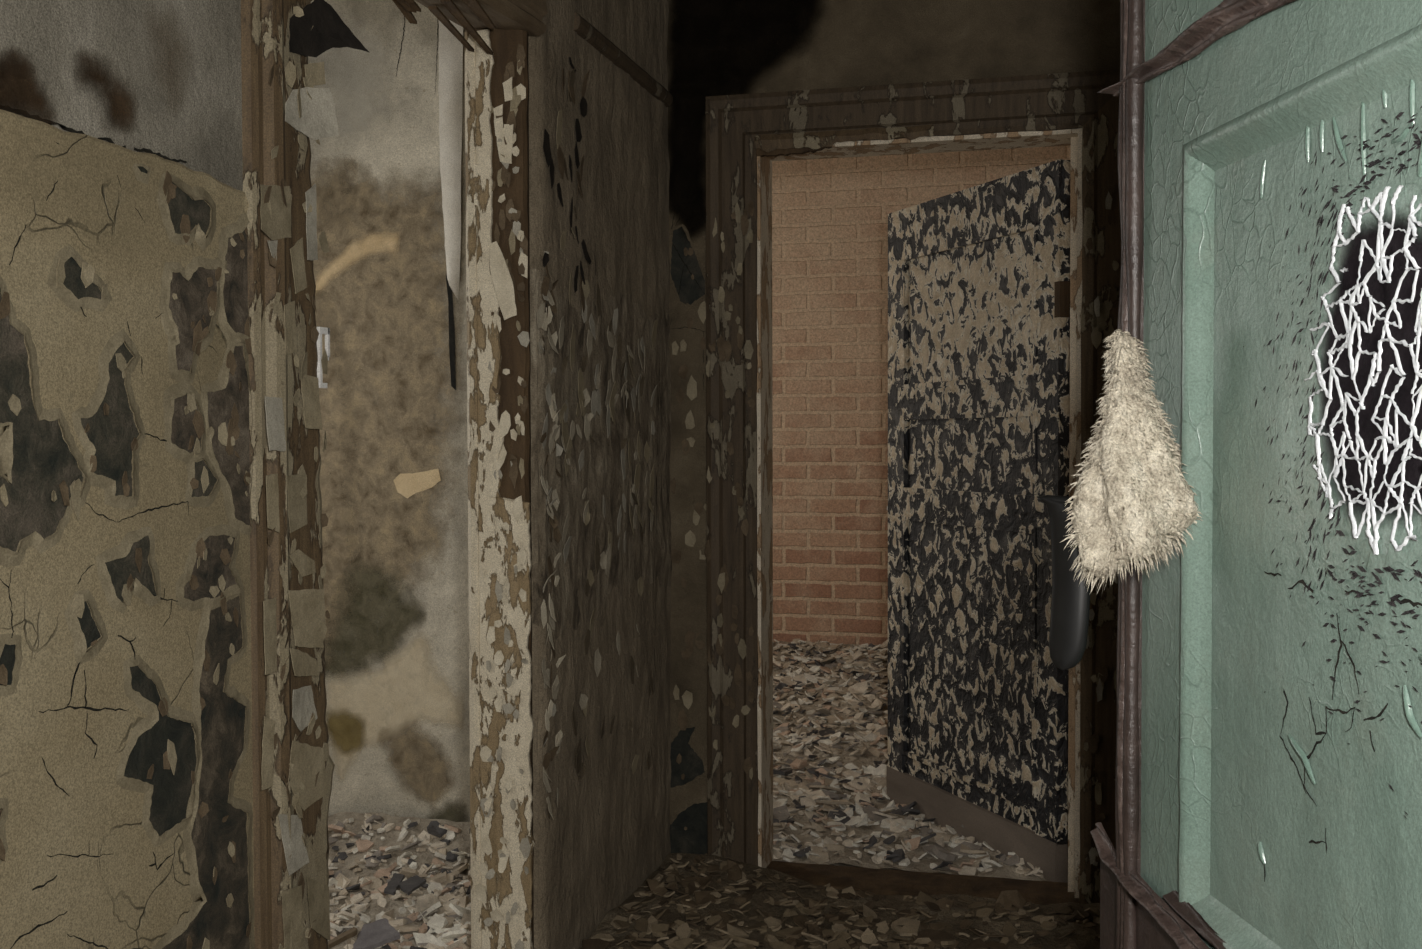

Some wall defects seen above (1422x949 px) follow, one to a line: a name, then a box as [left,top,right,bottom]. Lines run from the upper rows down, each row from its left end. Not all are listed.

water stain [0,52,52,120]
water stain [80,55,134,128]
water stain [671,90,706,237]
peeling [0,277,146,567]
crack [85,501,189,522]
peeling [64,164,330,949]
water stain [311,161,465,822]
peeling [473,43,754,855]
peeling [1255,106,1422,712]
crack [39,662,129,758]
crack [1264,571,1422,854]
crack [10,854,143,949]